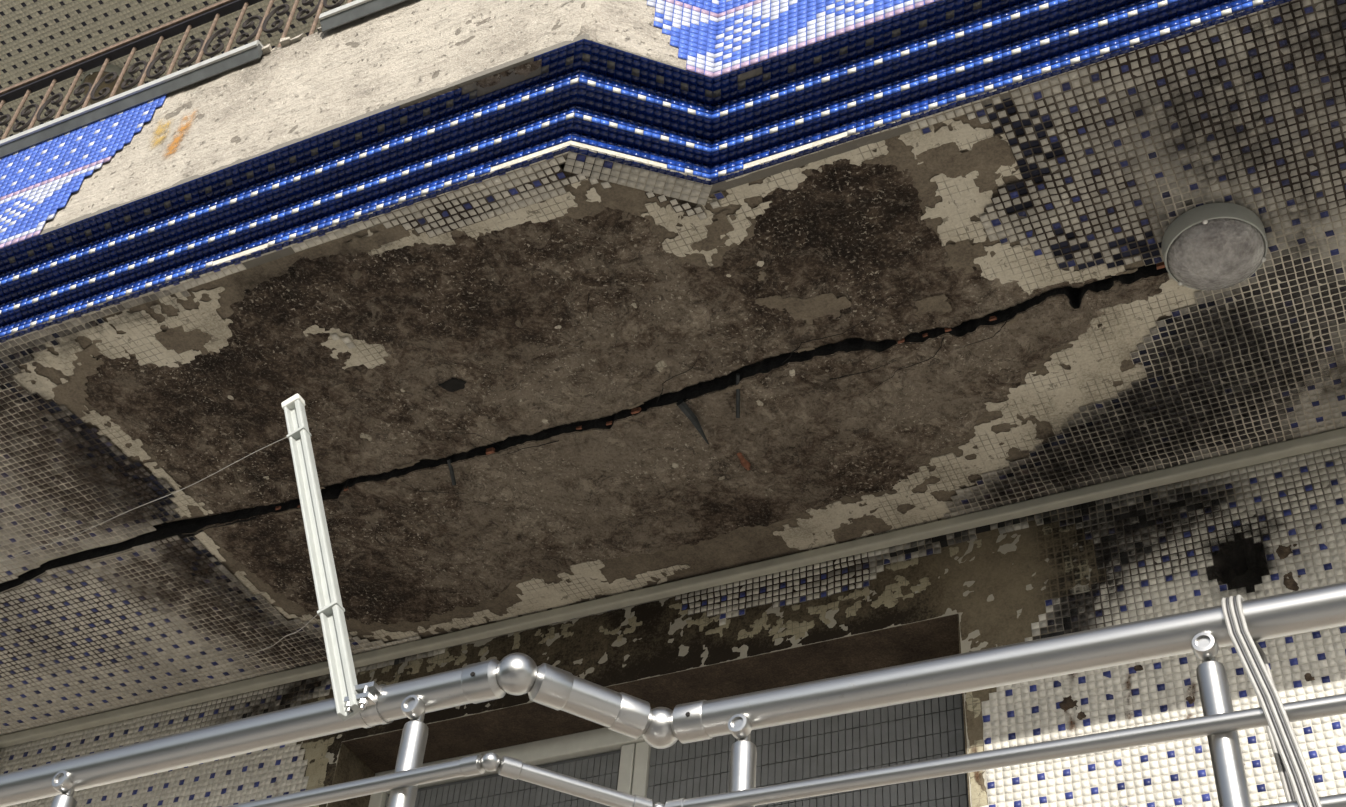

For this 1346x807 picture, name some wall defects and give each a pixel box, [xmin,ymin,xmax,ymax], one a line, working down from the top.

flaking render [41,0,687,231]
crack [0,262,1168,594]
spalling [0,93,1216,710]
water stain [982,309,1346,503]
water stain [1037,488,1224,626]
water stain [1204,512,1282,593]
flaking render [311,795,371,807]
flaking render [296,693,605,790]
flaking render [967,770,988,807]
flaking render [962,687,997,754]